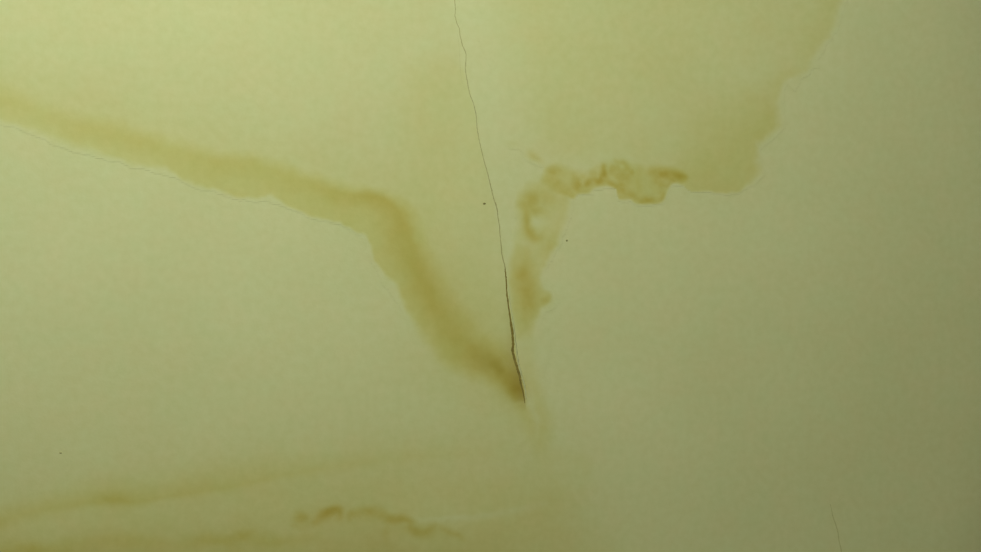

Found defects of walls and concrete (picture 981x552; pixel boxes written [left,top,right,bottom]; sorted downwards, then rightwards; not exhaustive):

leakage [0,0,725,552]
crack [454,0,527,403]
leakage [473,0,847,342]